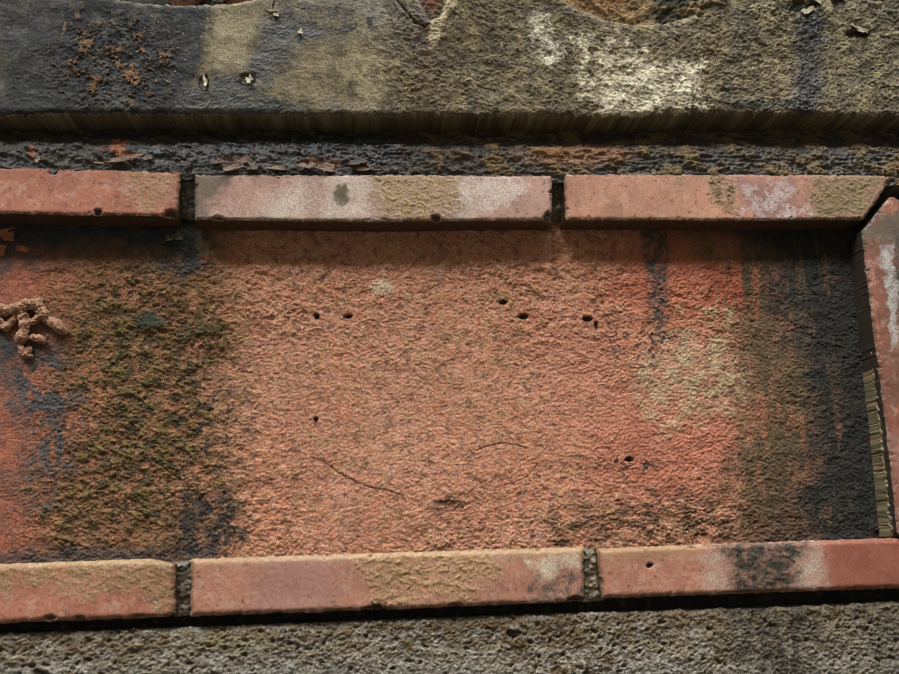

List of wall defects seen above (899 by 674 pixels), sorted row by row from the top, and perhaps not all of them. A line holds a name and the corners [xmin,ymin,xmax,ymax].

peeling [41,1,186,112]
flaking render [169,0,283,90]
crack [396,0,430,28]
damp [521,2,831,119]
peeling [0,227,29,256]
damp [0,343,94,511]
crack [310,457,404,496]